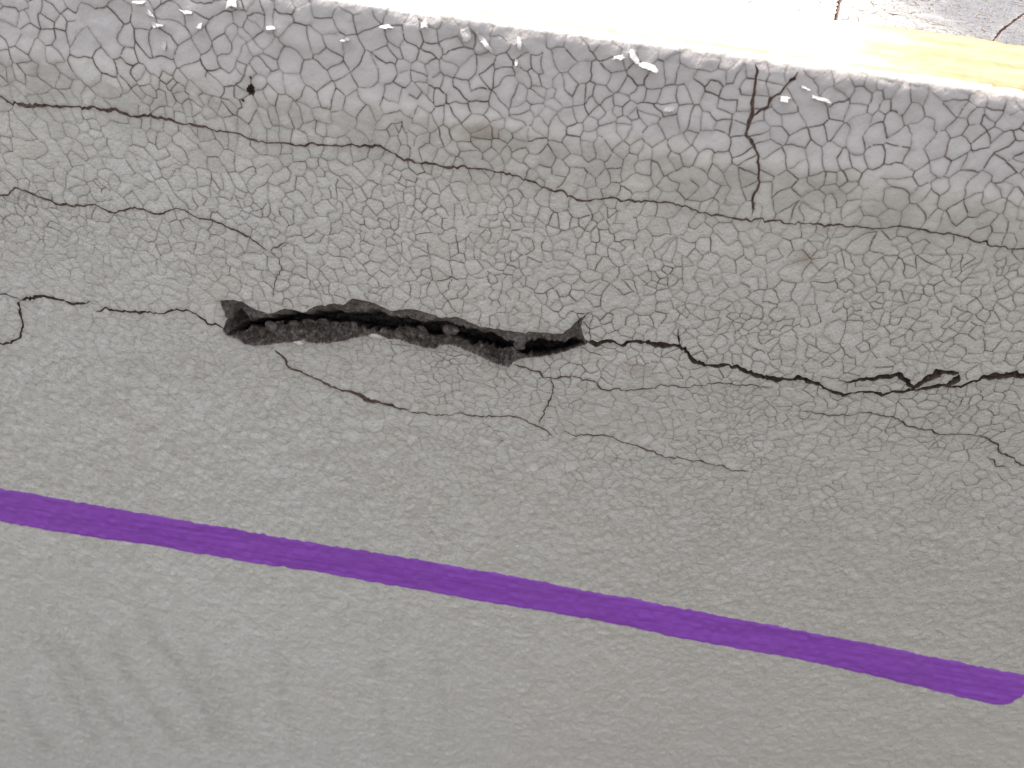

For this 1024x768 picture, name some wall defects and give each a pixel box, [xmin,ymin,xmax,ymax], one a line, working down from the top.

spalling [220,299,588,368]
crack [0,0,1024,472]